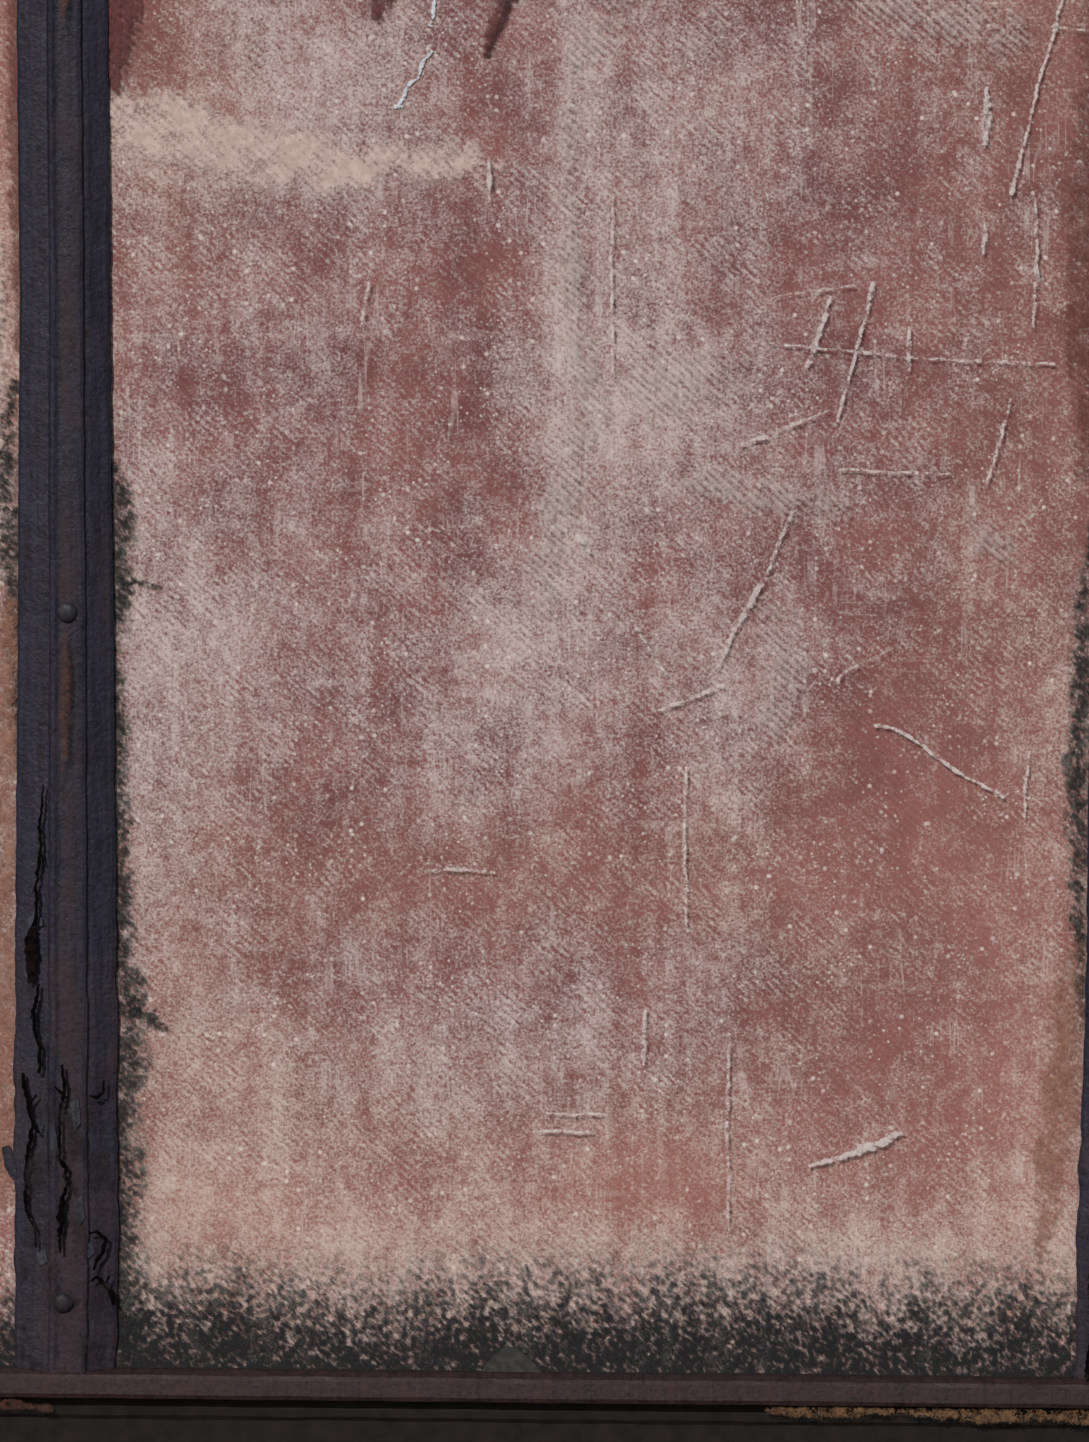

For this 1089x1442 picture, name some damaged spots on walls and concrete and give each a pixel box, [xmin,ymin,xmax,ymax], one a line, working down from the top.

rust [108,0,142,95]
rust [370,0,393,23]
rust [484,0,519,58]
leakage [1061,527,1089,1027]
crack [31,784,44,927]
leakage [111,460,1077,1377]
crack [21,984,115,1305]
crack [1081,1344,1089,1379]